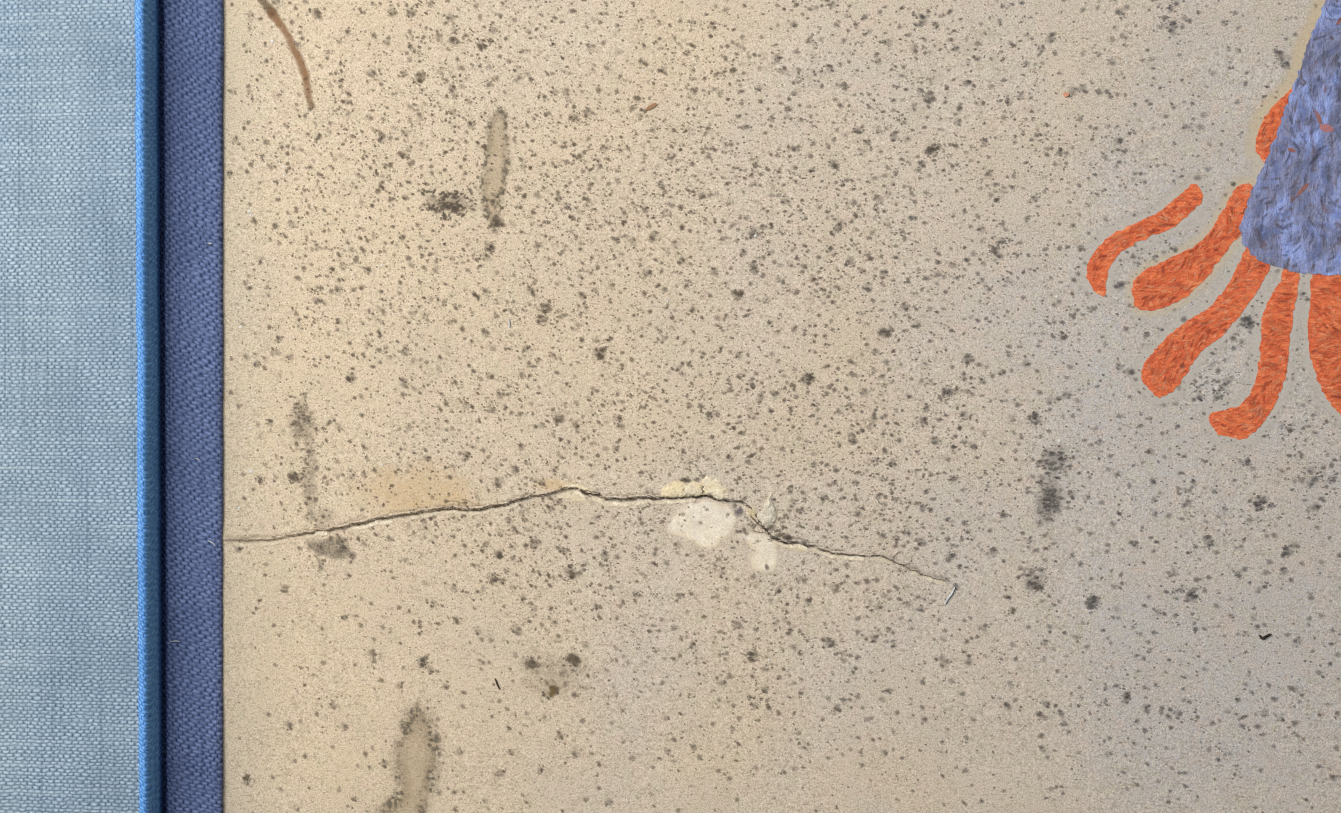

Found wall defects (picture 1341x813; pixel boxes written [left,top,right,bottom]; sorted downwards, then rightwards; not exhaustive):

water stain [228,0,1151,721]
crack [265,476,946,585]
spalling [668,500,777,572]
water stain [1085,491,1292,689]
water stain [364,699,464,812]